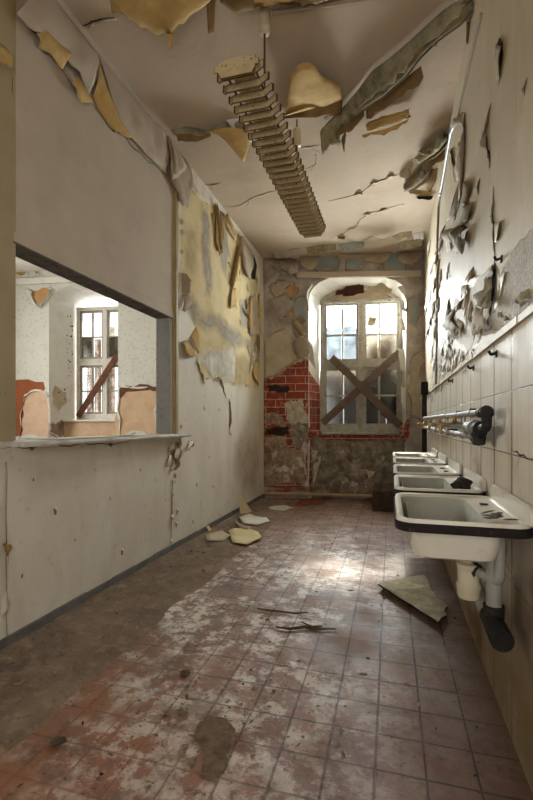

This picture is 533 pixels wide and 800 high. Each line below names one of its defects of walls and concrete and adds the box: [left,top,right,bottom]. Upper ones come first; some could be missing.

crack [328,175,399,202]
peeling [0,0,533,499]
crack [328,204,404,257]